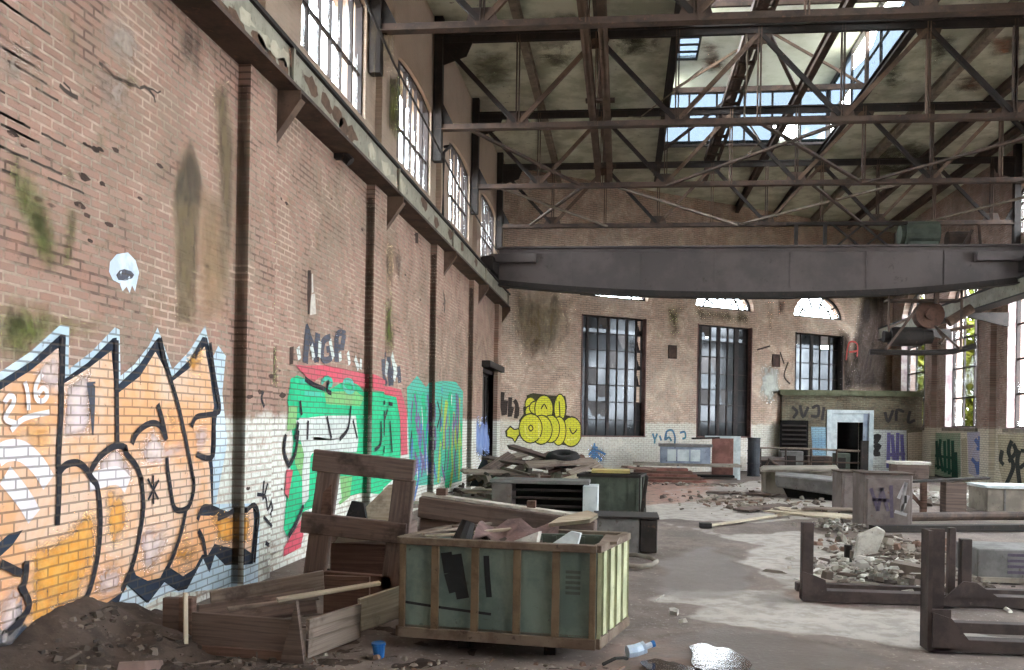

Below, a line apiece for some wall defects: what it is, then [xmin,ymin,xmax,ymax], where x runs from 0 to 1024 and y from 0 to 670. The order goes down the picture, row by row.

spalling [82,142,119,153]
crack [99,61,161,103]
leakage [217,85,248,265]
peeling [217,0,290,74]
peeling [304,75,406,195]
leakage [175,154,200,324]
leakage [518,296,561,353]
leakage [232,282,244,582]